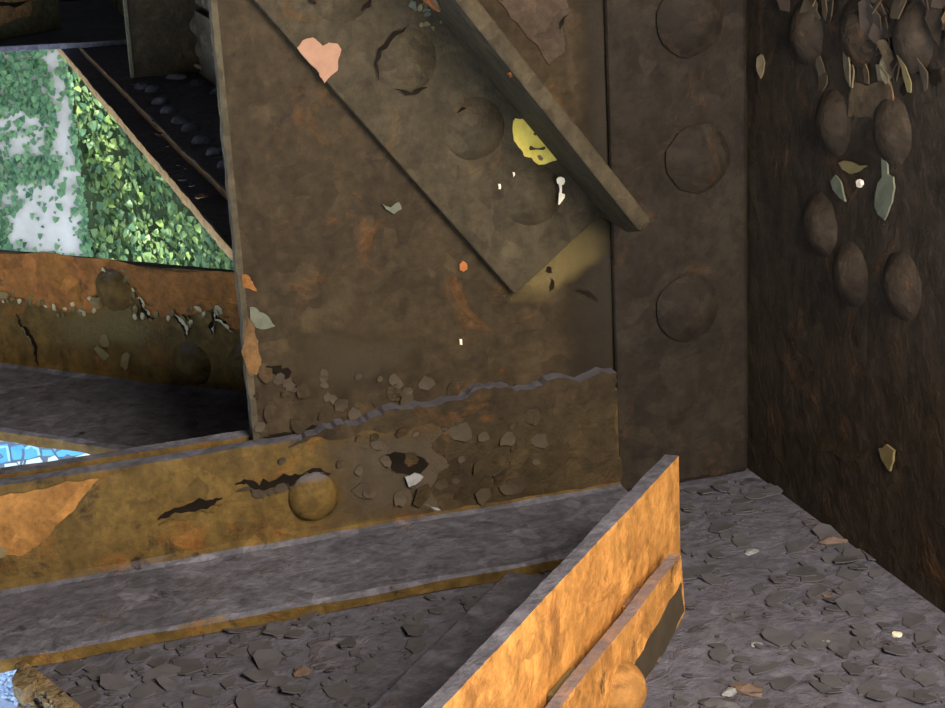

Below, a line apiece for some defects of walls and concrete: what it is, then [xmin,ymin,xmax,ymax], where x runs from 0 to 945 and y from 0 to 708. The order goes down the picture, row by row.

rust [0,0,36,26]
peeling [777,0,834,25]
peeling [921,0,945,45]
peeling [297,37,341,83]
peeling [756,54,765,78]
peeling [843,0,929,120]
peeling [830,160,868,202]
peeling [874,158,896,220]
crack [13,314,39,366]
rust [0,252,618,508]
rust [0,478,99,556]
crack [158,468,331,526]